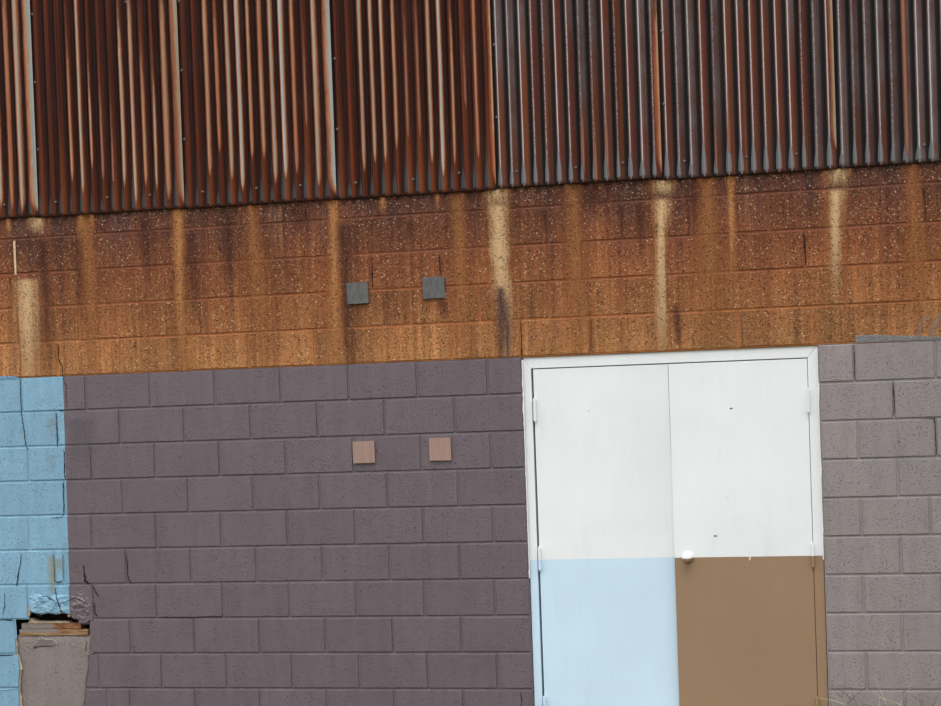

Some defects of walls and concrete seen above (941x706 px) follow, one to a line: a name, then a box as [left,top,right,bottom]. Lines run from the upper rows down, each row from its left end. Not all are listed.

corrosion [0,0,38,214]
corrosion [66,0,184,206]
corrosion [201,0,336,194]
corrosion [356,0,496,184]
leakage [14,280,41,368]
leakage [488,188,512,327]
corrosion [498,288,509,351]
leakage [654,179,671,334]
spalling [28,594,72,623]
crack [31,553,84,617]